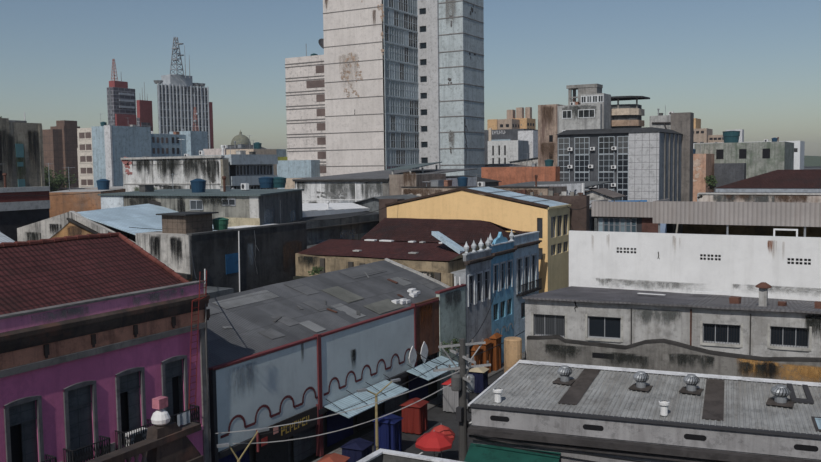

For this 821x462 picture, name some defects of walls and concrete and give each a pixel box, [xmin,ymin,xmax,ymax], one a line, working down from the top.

leakage [0,130,39,176]
leakage [132,158,219,180]
leakage [546,344,580,359]
leakage [608,353,648,367]
leakage [669,354,714,367]
leakage [740,362,777,377]